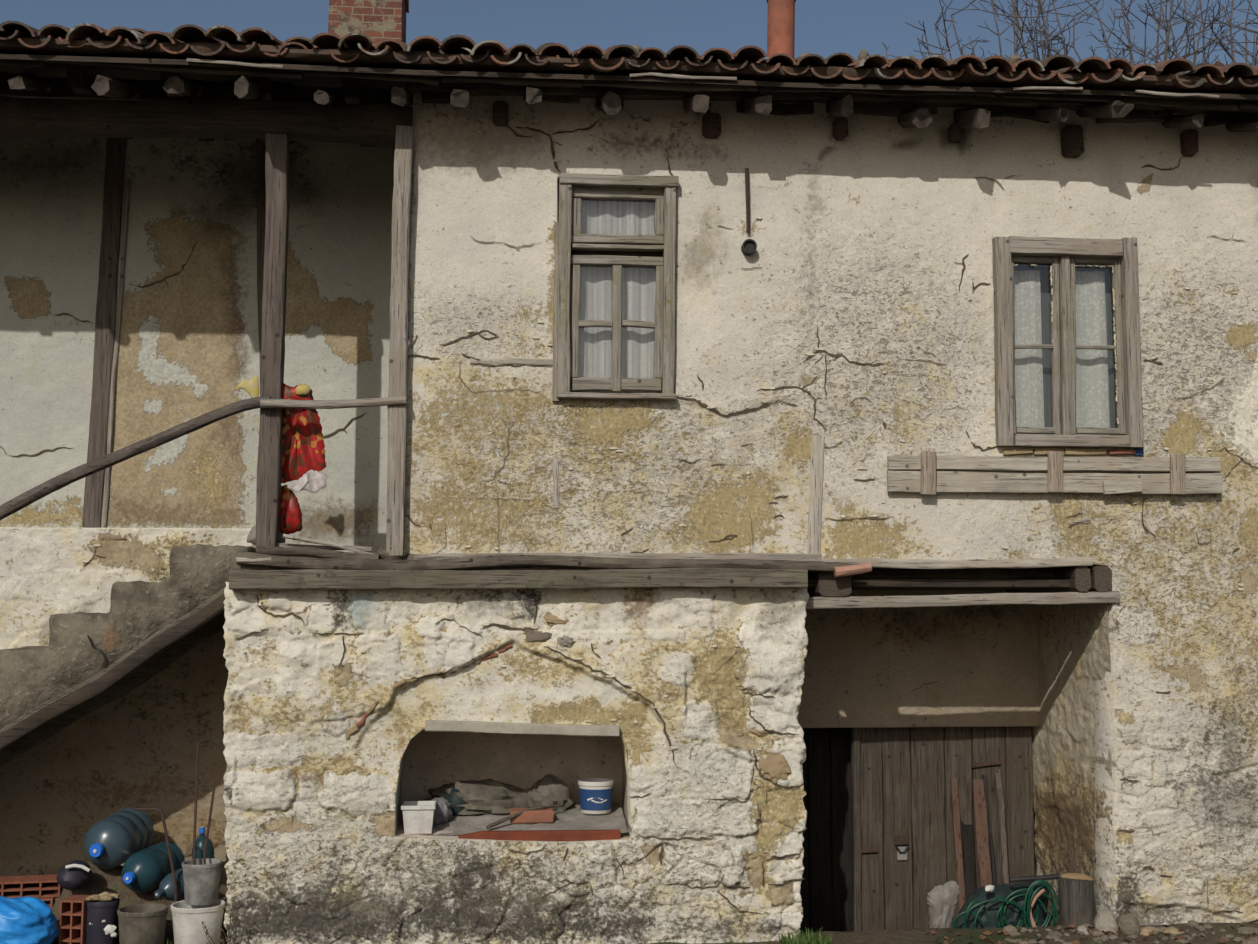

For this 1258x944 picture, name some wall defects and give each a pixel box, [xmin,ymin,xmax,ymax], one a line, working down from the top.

crack [506,119,600,173]
peeling [285,241,374,365]
peeling [0,208,250,579]
crack [323,413,366,438]
peeling [407,362,664,457]
peeling [780,424,819,468]
crack [677,325,946,481]
peeling [1157,407,1247,480]
peeling [405,466,558,554]
peeling [673,469,785,553]
crack [826,513,893,521]
crack [435,597,678,767]